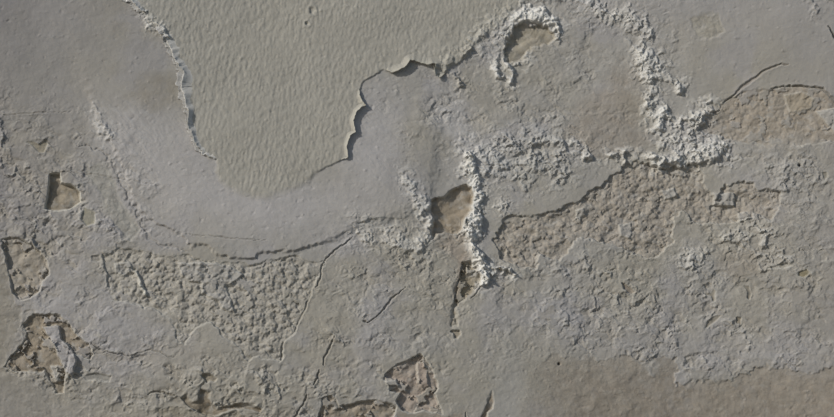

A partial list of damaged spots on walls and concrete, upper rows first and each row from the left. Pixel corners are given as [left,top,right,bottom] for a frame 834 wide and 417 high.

peeling [121,0,525,196]
crack [721,63,834,105]
spalling [352,183,476,255]
water stain [402,0,733,291]
spalling [492,83,834,279]
spalling [0,235,52,302]
spalling [101,245,327,364]
crack [280,236,354,362]
spalling [451,260,482,328]
spalling [3,312,95,395]
crack [322,335,336,367]
spalling [317,353,445,417]